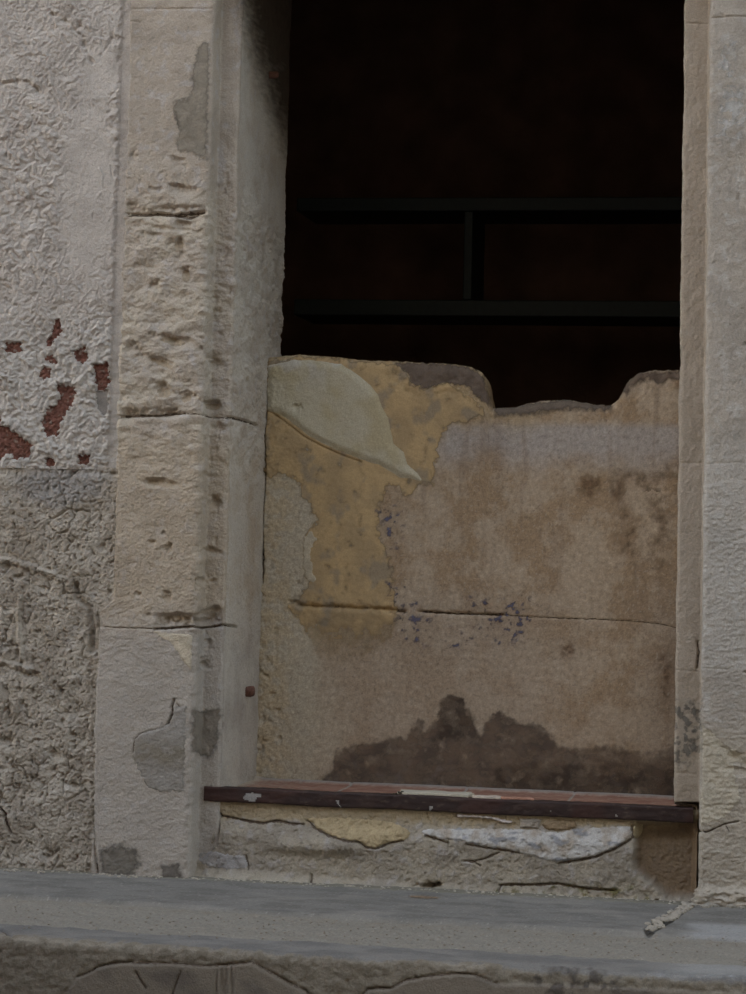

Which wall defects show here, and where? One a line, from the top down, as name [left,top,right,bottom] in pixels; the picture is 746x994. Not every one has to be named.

flaking render [5,342,23,353]
flaking render [39,319,77,437]
flaking render [73,346,111,415]
flaking render [0,419,33,461]
peeling [263,354,490,642]
crack [397,610,676,628]
water stain [323,695,700,796]
crack [222,815,401,849]
crack [426,835,519,866]
crack [498,826,634,892]